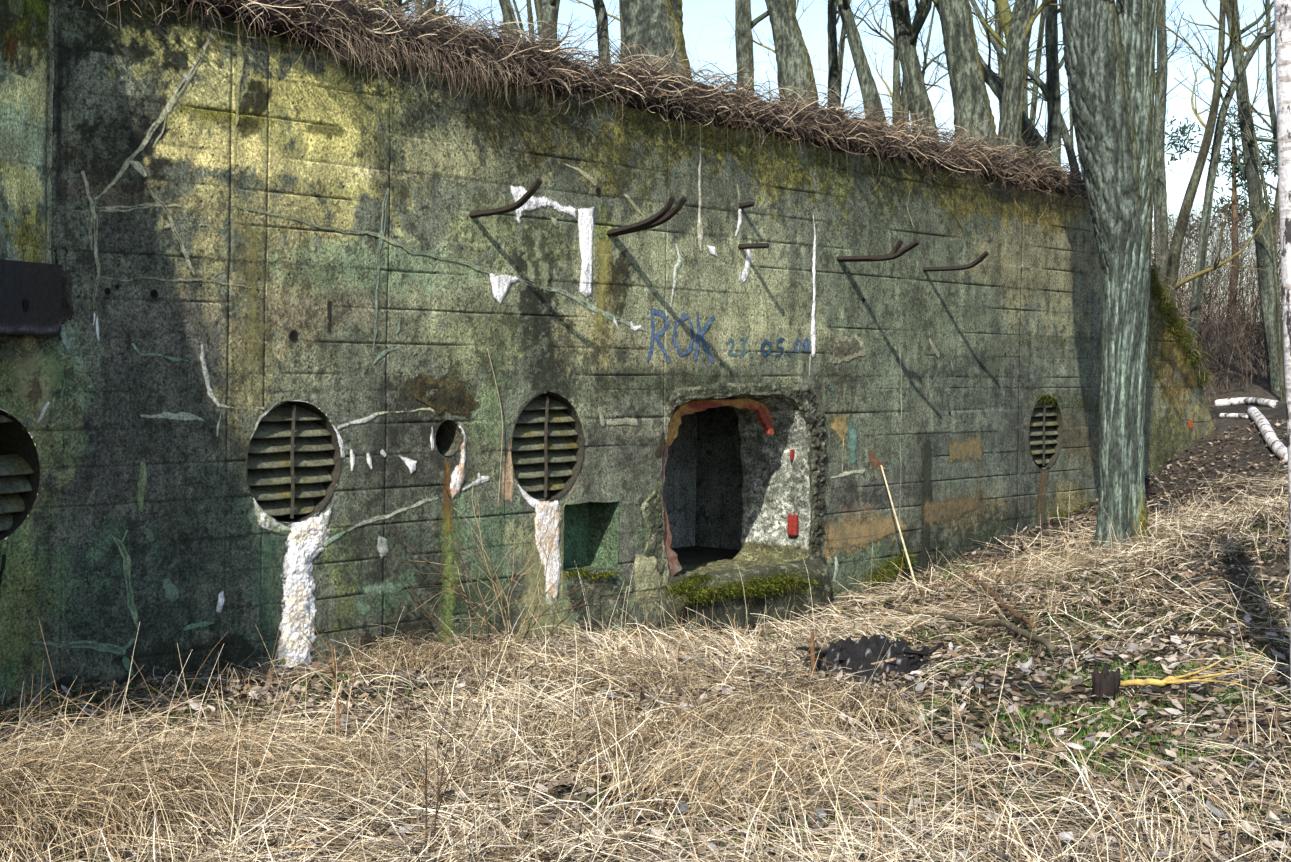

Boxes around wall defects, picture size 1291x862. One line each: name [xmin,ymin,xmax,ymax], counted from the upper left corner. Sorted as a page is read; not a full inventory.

crack [59,28,262,342]
crack [131,343,264,437]
leakage [253,497,332,671]
corrosion [443,460,452,532]
leakage [517,484,583,640]
spalling [559,381,897,637]